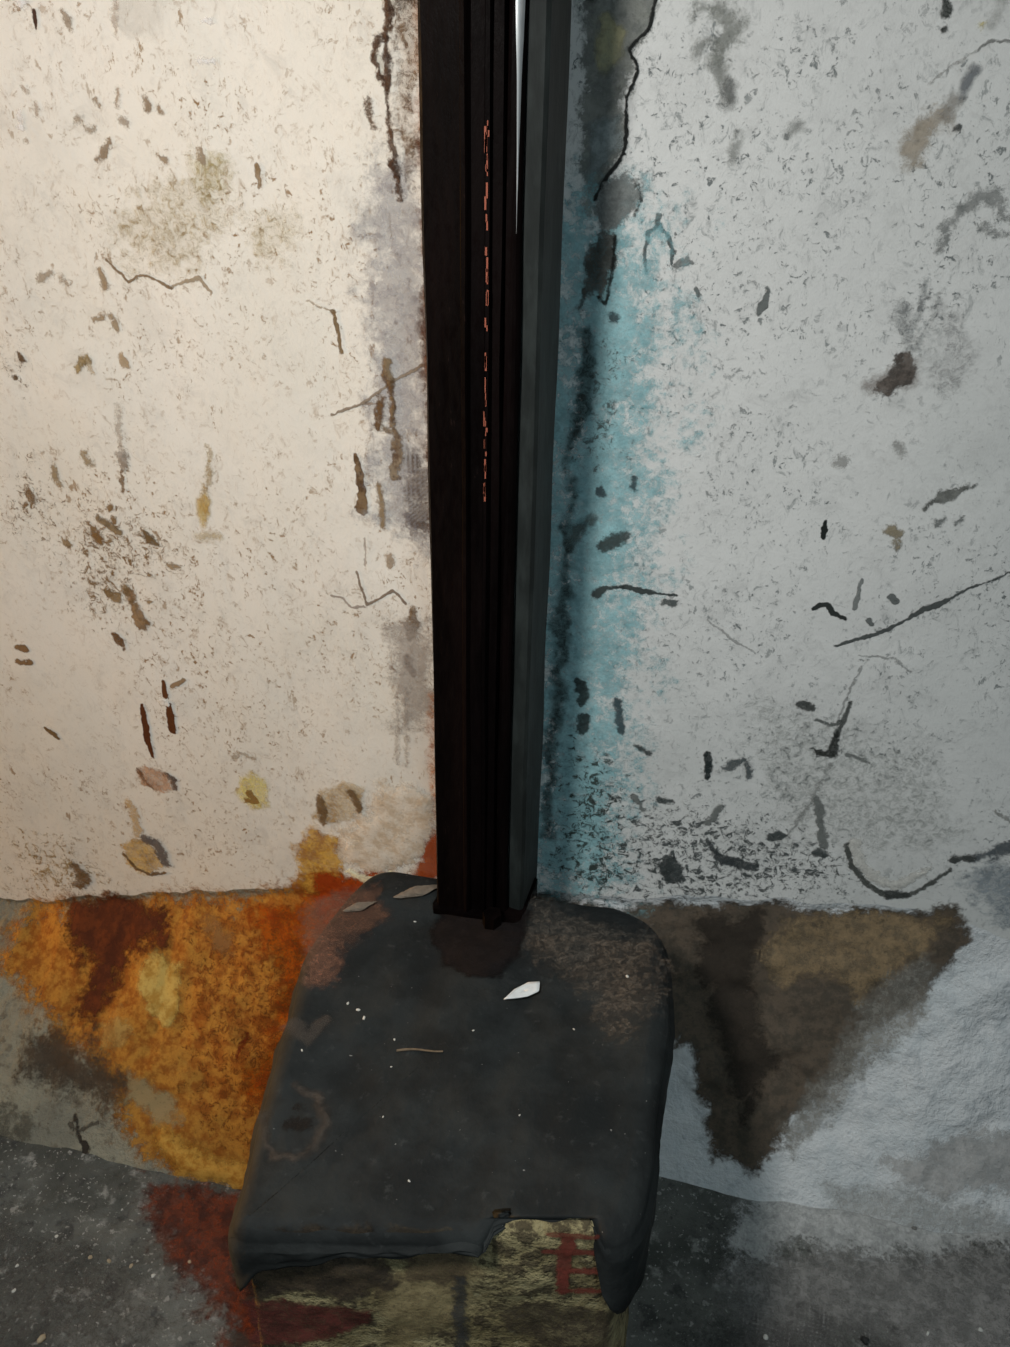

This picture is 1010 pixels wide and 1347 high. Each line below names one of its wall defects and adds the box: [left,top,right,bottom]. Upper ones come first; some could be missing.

corrosion [396,0,420,158]
spalling [578,0,658,310]
spalling [941,0,952,32]
leakage [936,187,1009,252]
spalling [864,352,917,396]
leakage [536,172,973,1176]
crack [812,572,1010,733]
spalling [292,783,372,894]
corrosion [415,689,437,878]
corrosion [0,872,378,1347]